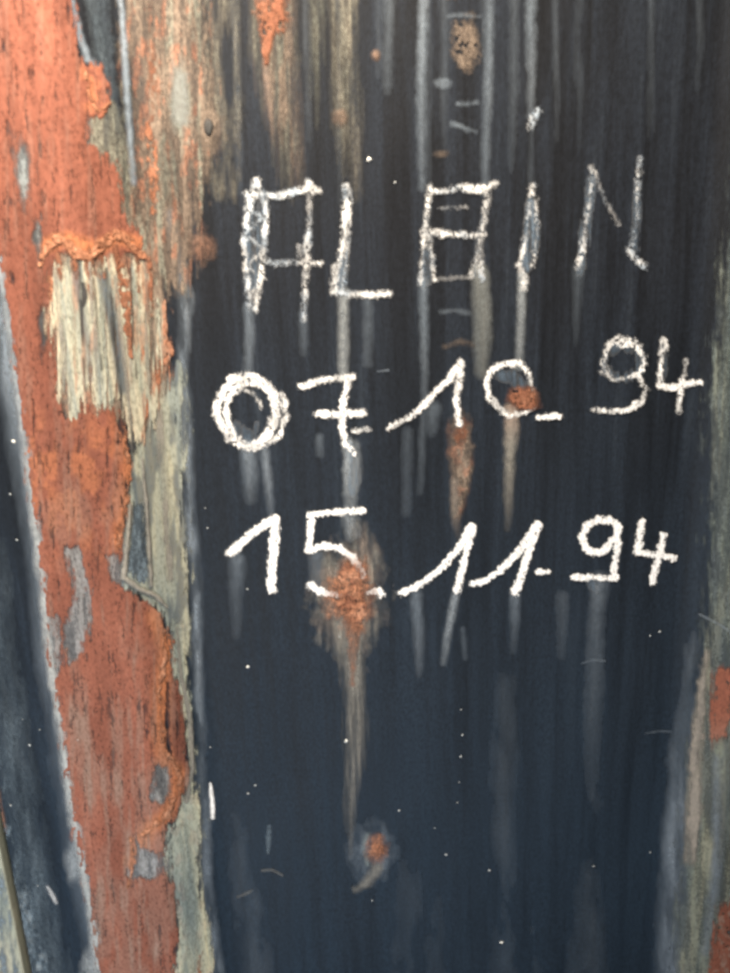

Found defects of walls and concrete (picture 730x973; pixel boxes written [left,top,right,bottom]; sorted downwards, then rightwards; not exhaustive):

peeling [14,140,29,201]
rust [505,387,537,477]
rust [0,0,222,973]
peeling [43,243,214,973]
rust [322,541,374,741]
rust [709,667,730,743]
rust [708,903,730,973]